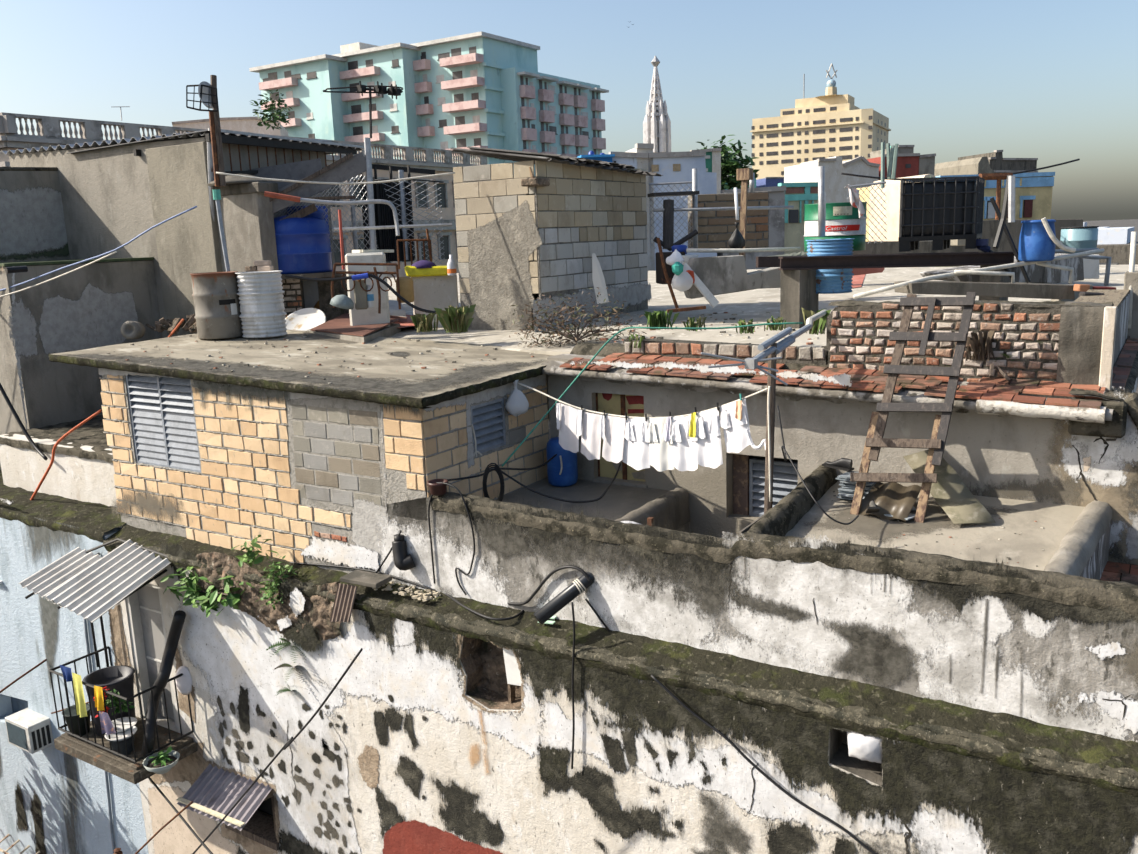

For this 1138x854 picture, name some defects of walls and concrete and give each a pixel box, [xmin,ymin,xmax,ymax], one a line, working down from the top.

crack [1072,437,1109,501]
peeling [1059,386,1138,487]
spalling [108,605,131,666]
peeling [301,517,515,607]
leakage [362,599,477,674]
leakage [464,499,810,624]
leakage [788,501,1138,692]
peeling [1109,521,1127,548]
mould [217,686,361,854]
mould [373,695,506,847]
peeling [147,552,990,854]
leakage [492,622,1138,854]